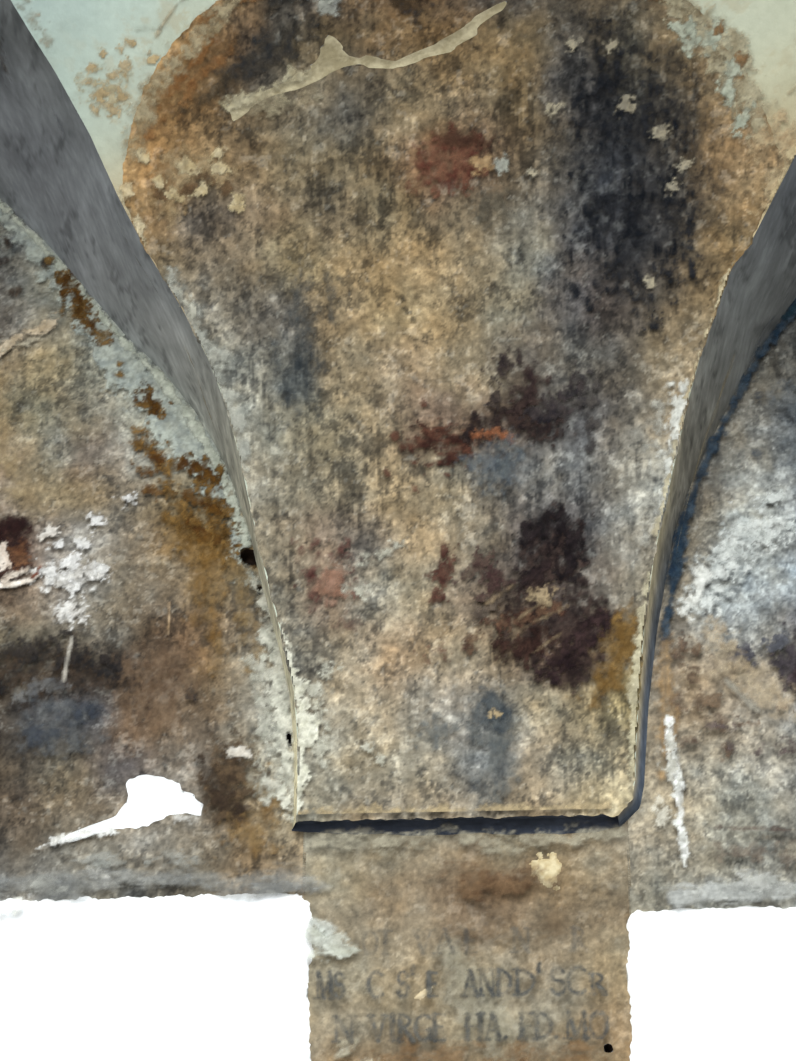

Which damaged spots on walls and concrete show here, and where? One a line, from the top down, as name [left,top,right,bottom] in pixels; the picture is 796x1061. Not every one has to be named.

flaking render [221,0,507,121]
leakage [545,17,708,331]
leakage [0,512,197,755]
rust [116,361,242,647]
leakage [425,502,639,708]
leakage [724,622,796,713]
flaking render [39,775,203,848]